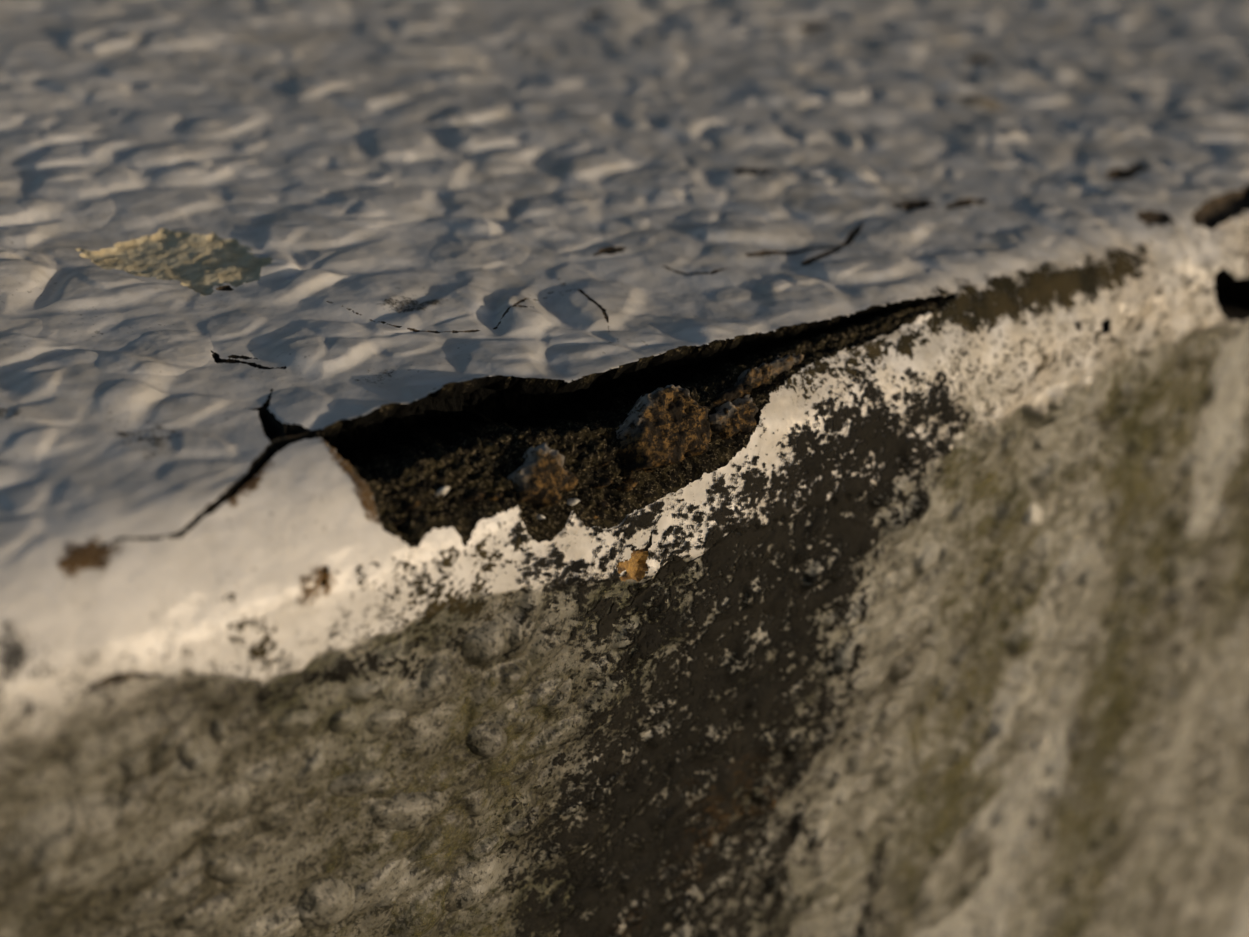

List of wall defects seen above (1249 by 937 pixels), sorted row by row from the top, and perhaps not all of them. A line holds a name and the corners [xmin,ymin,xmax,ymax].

peeling [593,246,626,256]
peeling [1136,209,1177,228]
spalling [1191,184,1249,230]
crack [98,350,322,548]
spalling [312,292,964,548]
leakage [210,352,974,937]